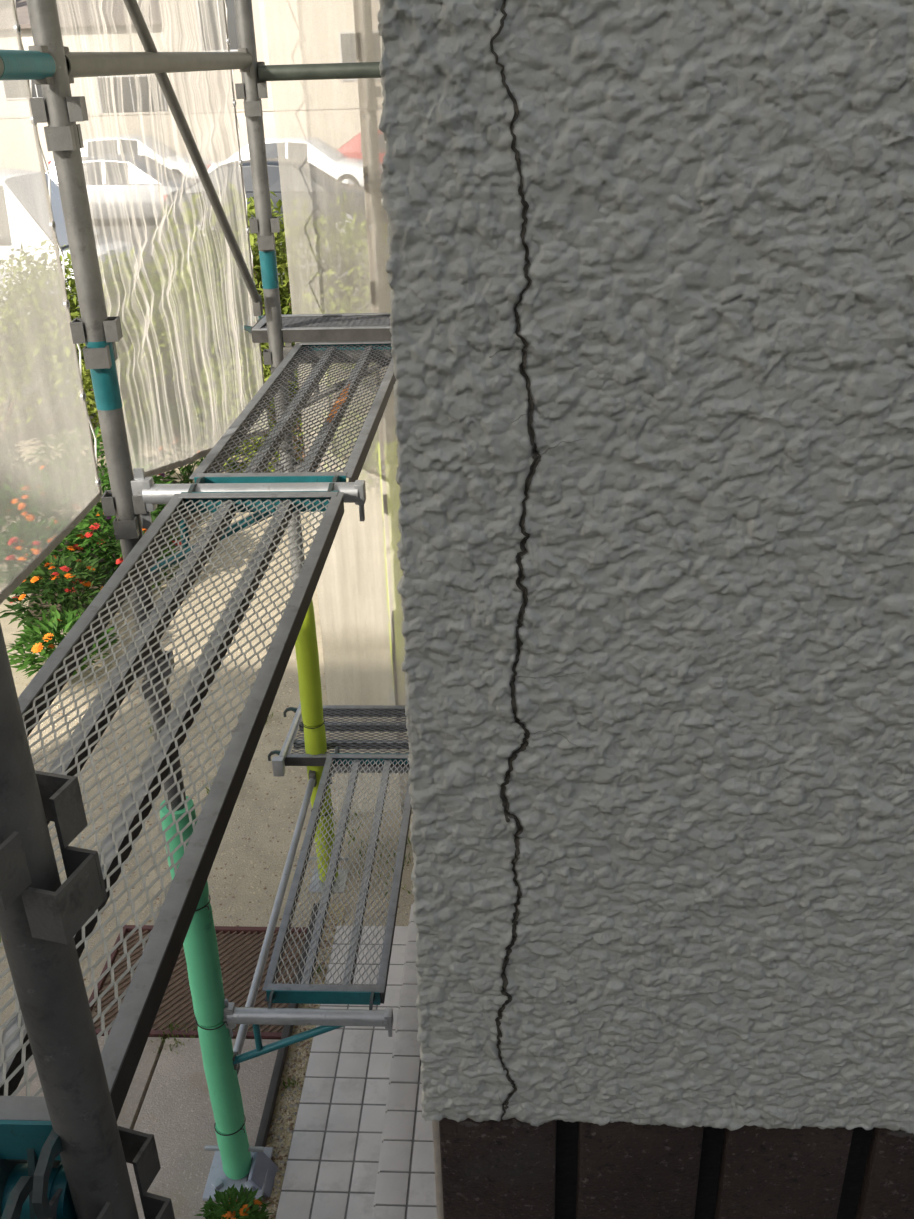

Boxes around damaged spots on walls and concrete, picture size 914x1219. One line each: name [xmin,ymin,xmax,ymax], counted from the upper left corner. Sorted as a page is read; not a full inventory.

crack [490,0,584,1121]